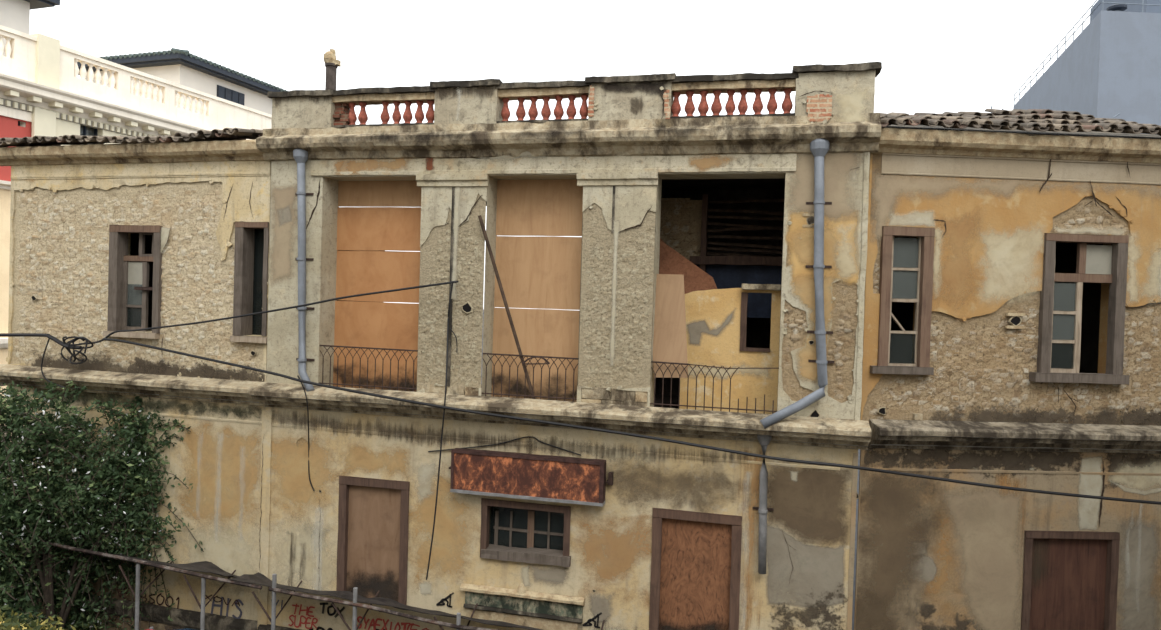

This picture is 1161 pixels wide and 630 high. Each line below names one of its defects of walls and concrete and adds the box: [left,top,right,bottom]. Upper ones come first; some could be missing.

flaking render [803,90,867,124]
crack [1040,159,1052,191]
crack [1085,162,1130,218]
flaking render [417,194,486,396]
flaking render [578,203,656,407]
peeling [687,312,734,345]
flaking render [781,174,1161,425]
leakage [522,566,566,586]
leakage [579,516,652,585]
leakage [607,446,1082,630]
leakage [1118,521,1159,630]